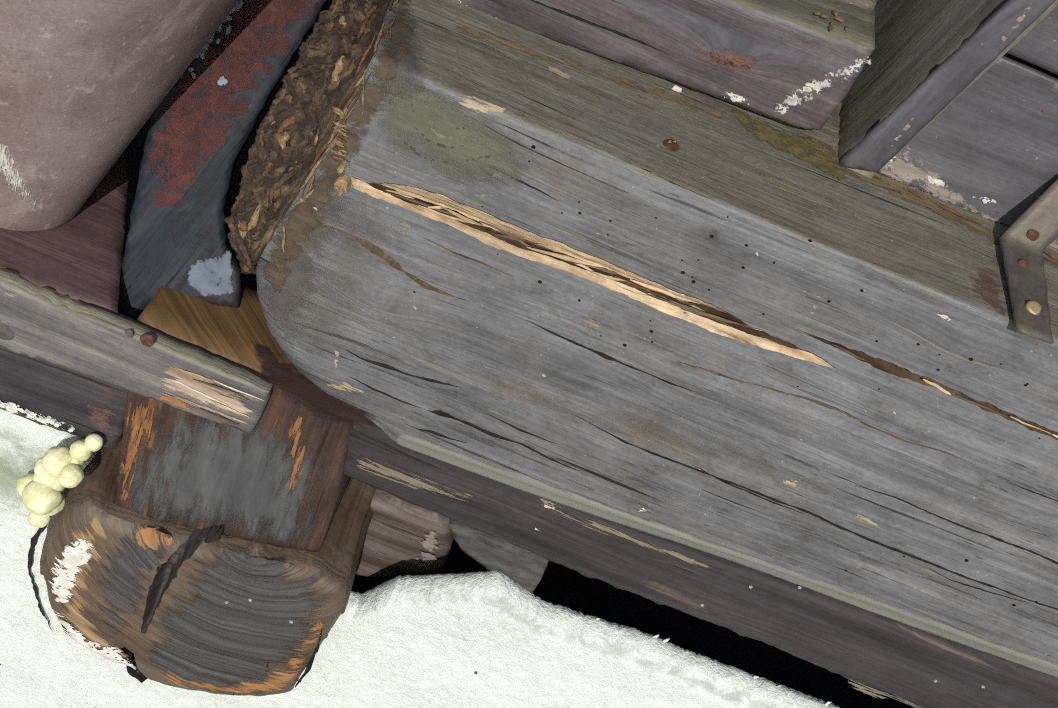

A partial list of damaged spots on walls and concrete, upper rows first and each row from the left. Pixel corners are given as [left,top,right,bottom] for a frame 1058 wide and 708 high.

crack [490,167,557,201]
crack [318,226,467,301]
crack [351,176,1058,440]
crack [345,349,575,470]
crack [533,323,974,465]
crack [115,525,224,683]